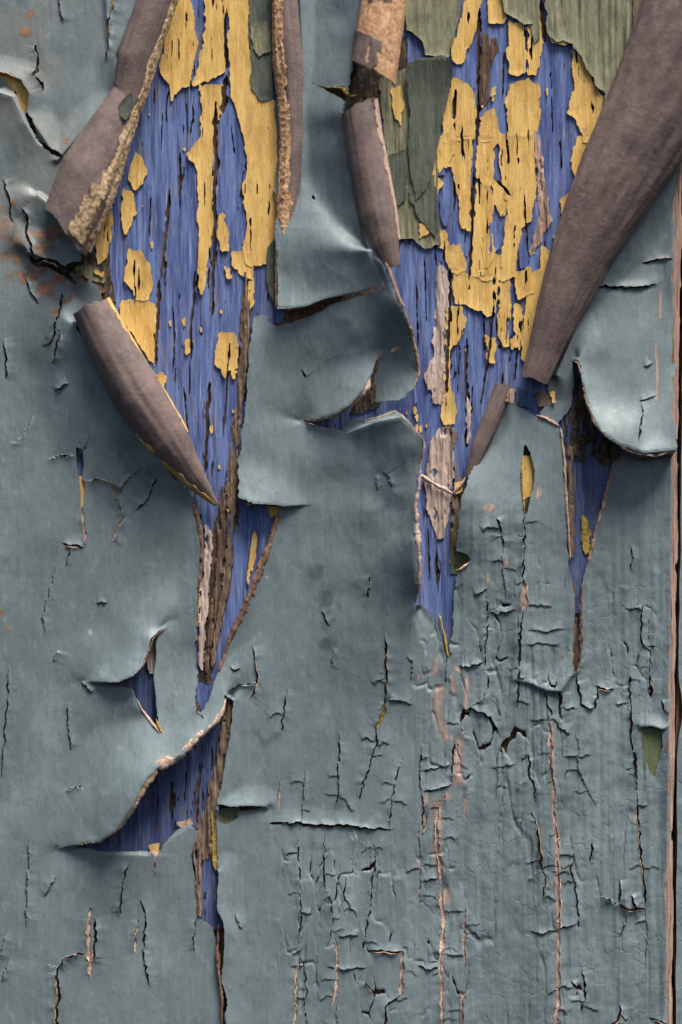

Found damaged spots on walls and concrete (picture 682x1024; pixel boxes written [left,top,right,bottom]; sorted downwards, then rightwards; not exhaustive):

crack [32,46,44,91]
crack [3,180,68,391]
peeling [0,0,682,784]
crack [269,511,665,1024]
crack [0,838,56,982]
crack [47,909,97,1024]
crack [119,867,149,986]
crack [151,851,159,876]
peeling [71,697,263,1024]